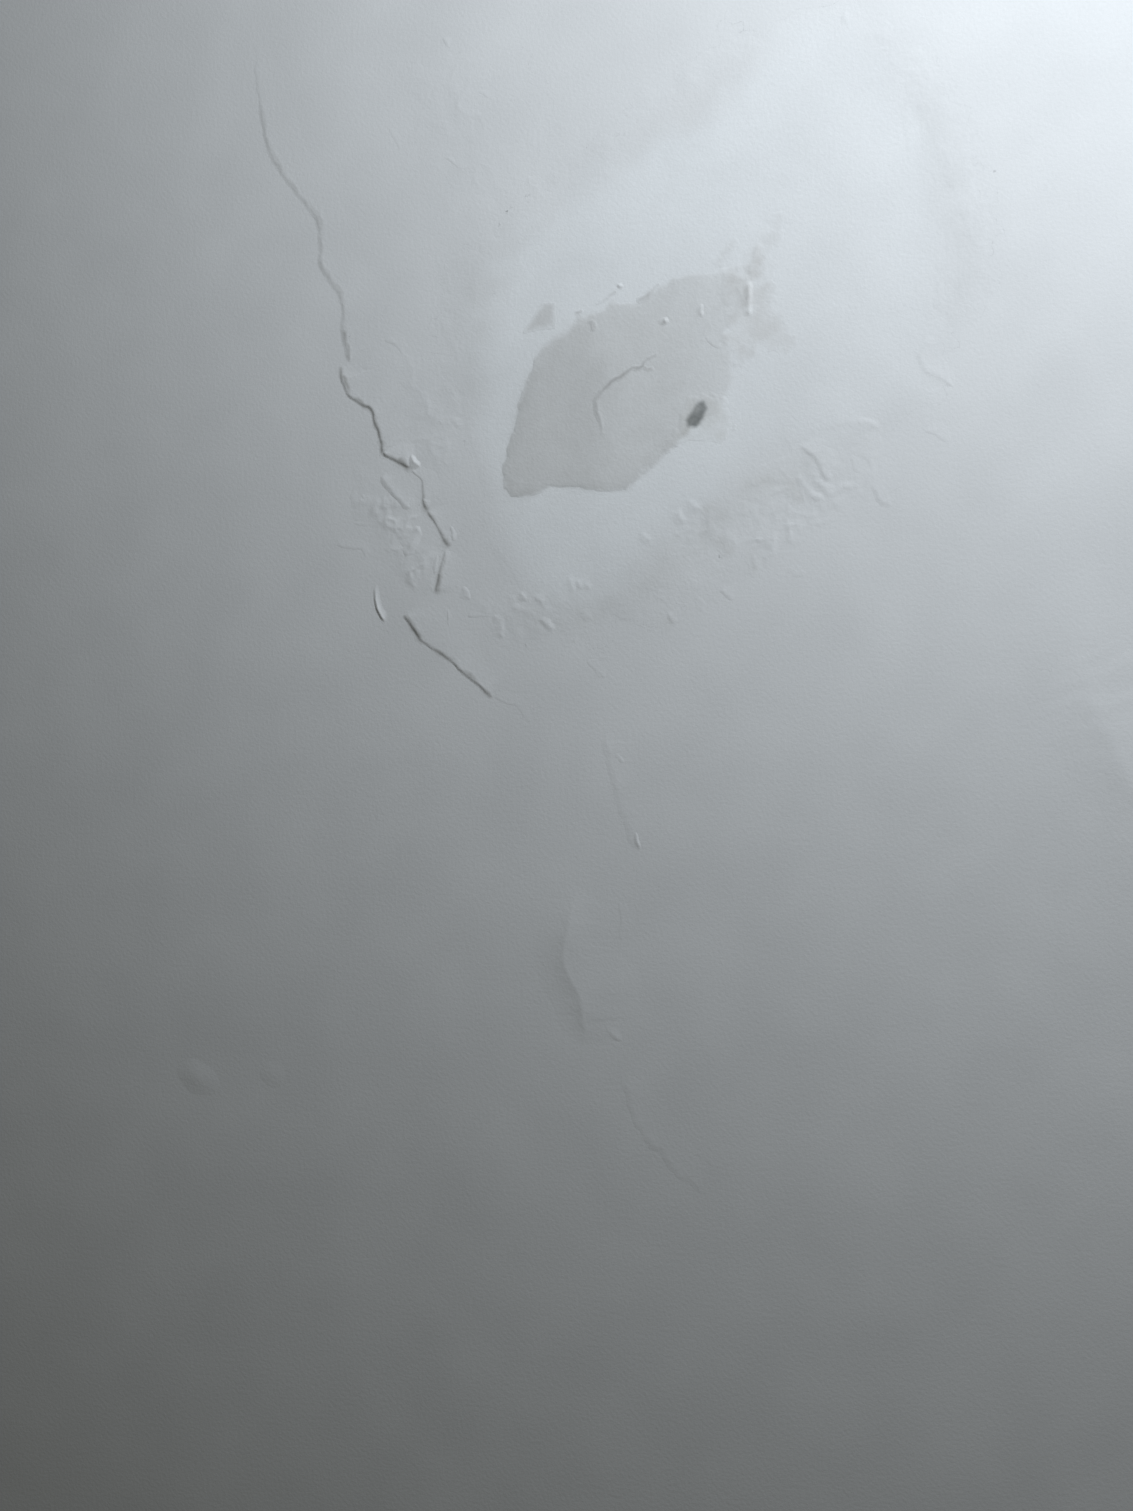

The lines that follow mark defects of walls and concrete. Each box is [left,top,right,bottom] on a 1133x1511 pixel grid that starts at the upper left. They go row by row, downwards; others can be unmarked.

spalling [502,211,798,498]